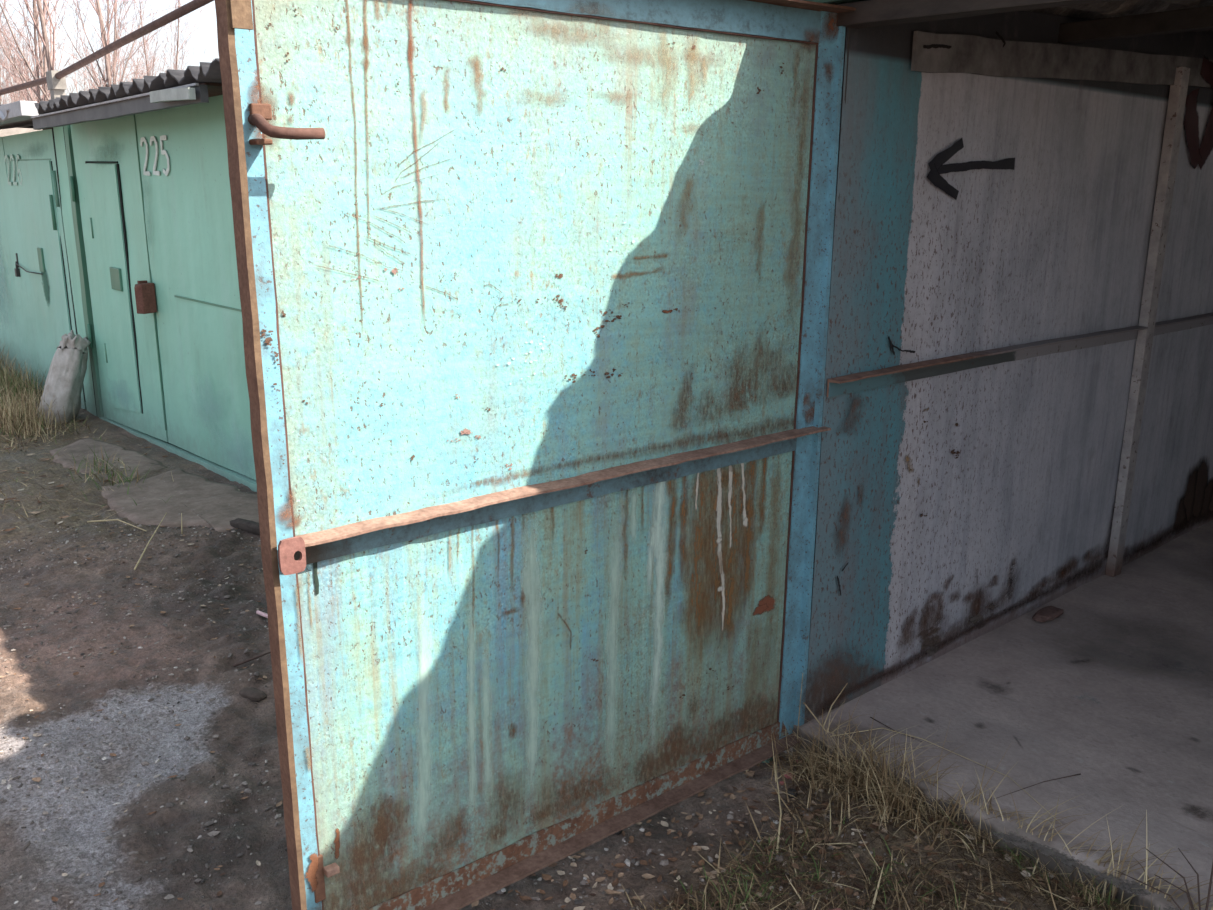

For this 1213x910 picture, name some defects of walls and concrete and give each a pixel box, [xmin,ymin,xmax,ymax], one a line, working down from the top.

corrosion [346,0,390,186]
corrosion [409,0,426,309]
corrosion [356,195,369,315]
corrosion [613,255,667,278]
corrosion [634,382,815,454]
corrosion [281,491,301,526]
corrosion [666,457,779,635]
corrosion [1123,513,1213,561]
corrosion [826,499,1116,705]
corrosion [305,853,319,893]
corrosion [334,806,442,910]